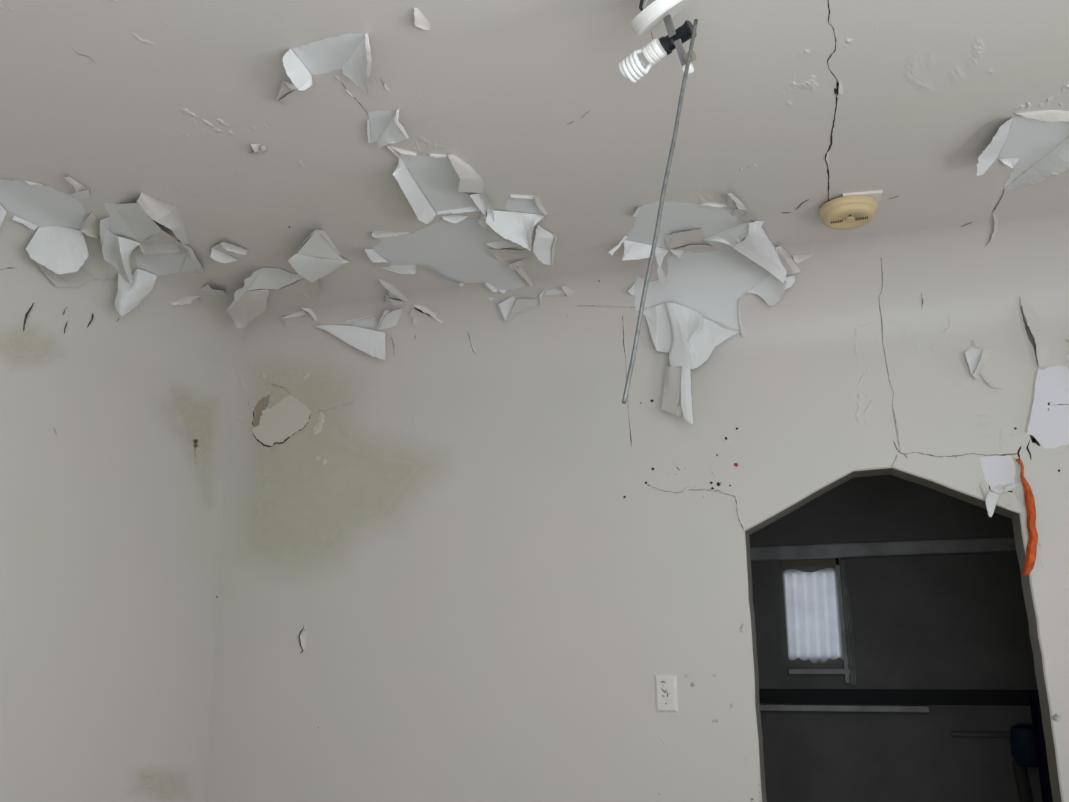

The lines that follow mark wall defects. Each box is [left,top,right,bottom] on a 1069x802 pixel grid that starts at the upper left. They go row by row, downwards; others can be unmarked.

peeling [276,33,372,106]
crack [783,1,843,213]
peeling [976,110,1069,190]
spalling [252,395,270,427]
peeling [0,109,575,360]
crack [653,487,745,530]
peeling [608,193,815,424]
crack [878,259,1017,467]
peeling [979,455,1021,517]
peeling [1016,296,1069,449]